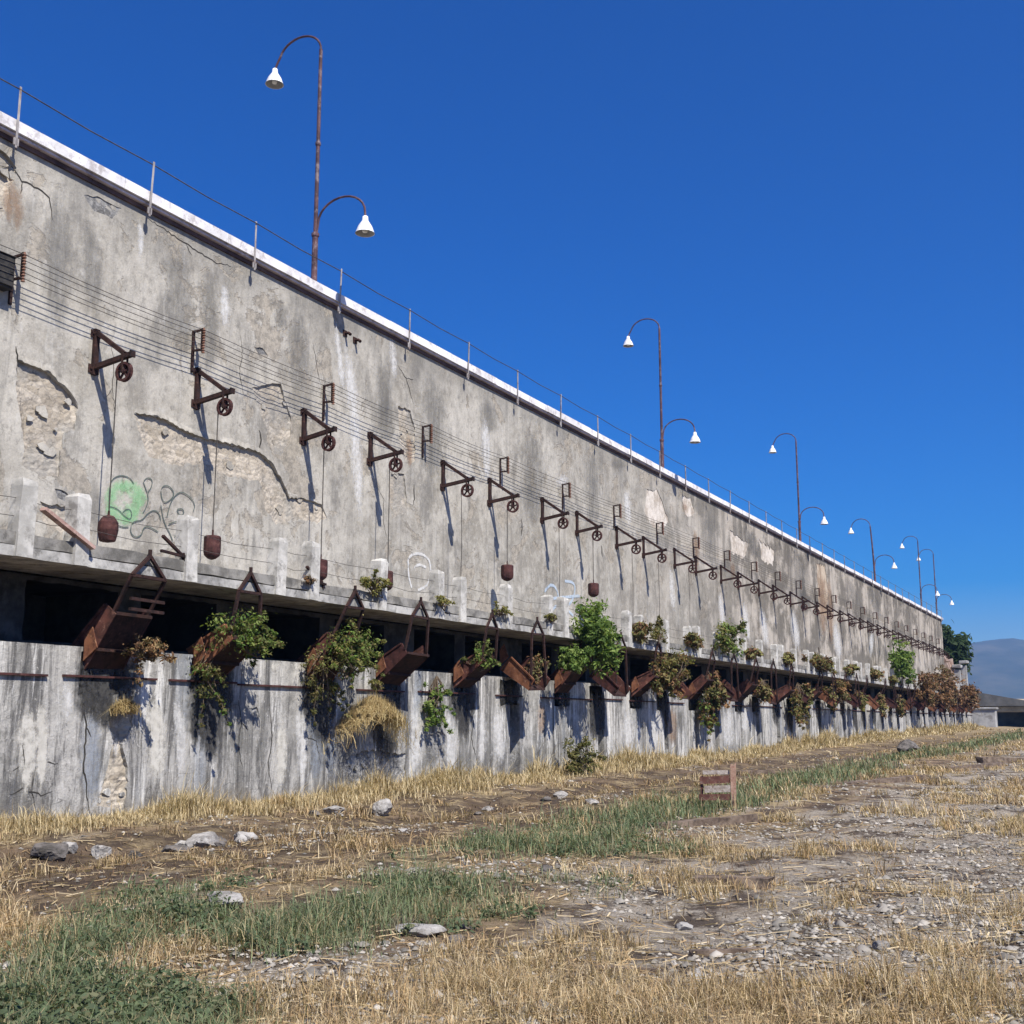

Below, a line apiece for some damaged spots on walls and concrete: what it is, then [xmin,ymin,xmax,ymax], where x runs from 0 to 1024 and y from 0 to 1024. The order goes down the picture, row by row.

crack [0,165,53,220]
peeling [16,355,78,534]
peeling [134,383,326,524]
peeling [644,489,669,529]
peeling [730,531,774,566]
water stain [18,706,48,792]
crack [10,714,91,813]
water stain [65,661,137,788]
spalling [97,706,132,809]
water stain [146,671,233,777]
water stain [276,674,337,784]
water stain [372,683,423,771]